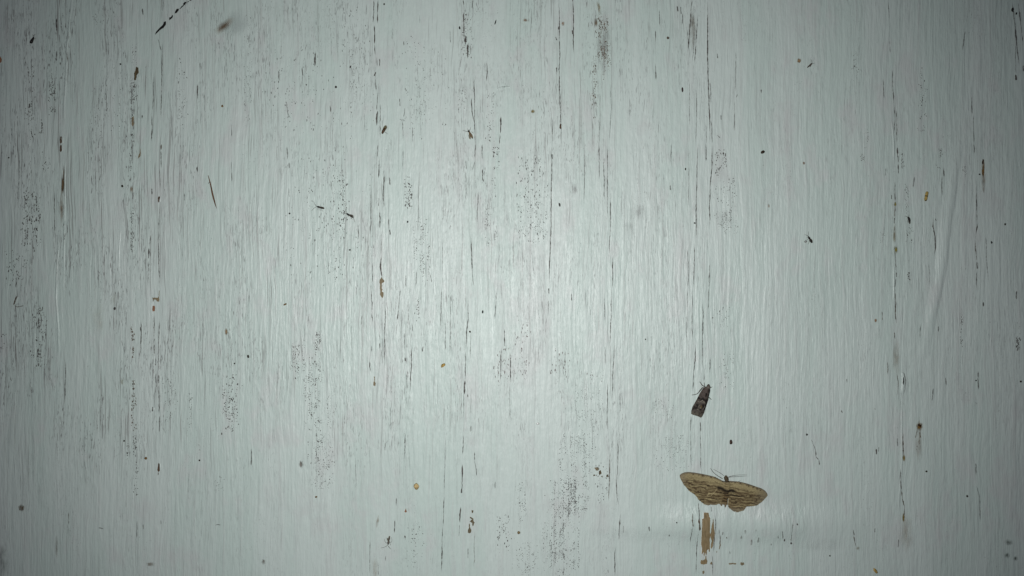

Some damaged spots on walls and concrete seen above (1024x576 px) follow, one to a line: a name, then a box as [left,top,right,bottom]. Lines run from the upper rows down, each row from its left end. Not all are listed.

peeling [592,14,611,118]
peeling [700,512,721,574]